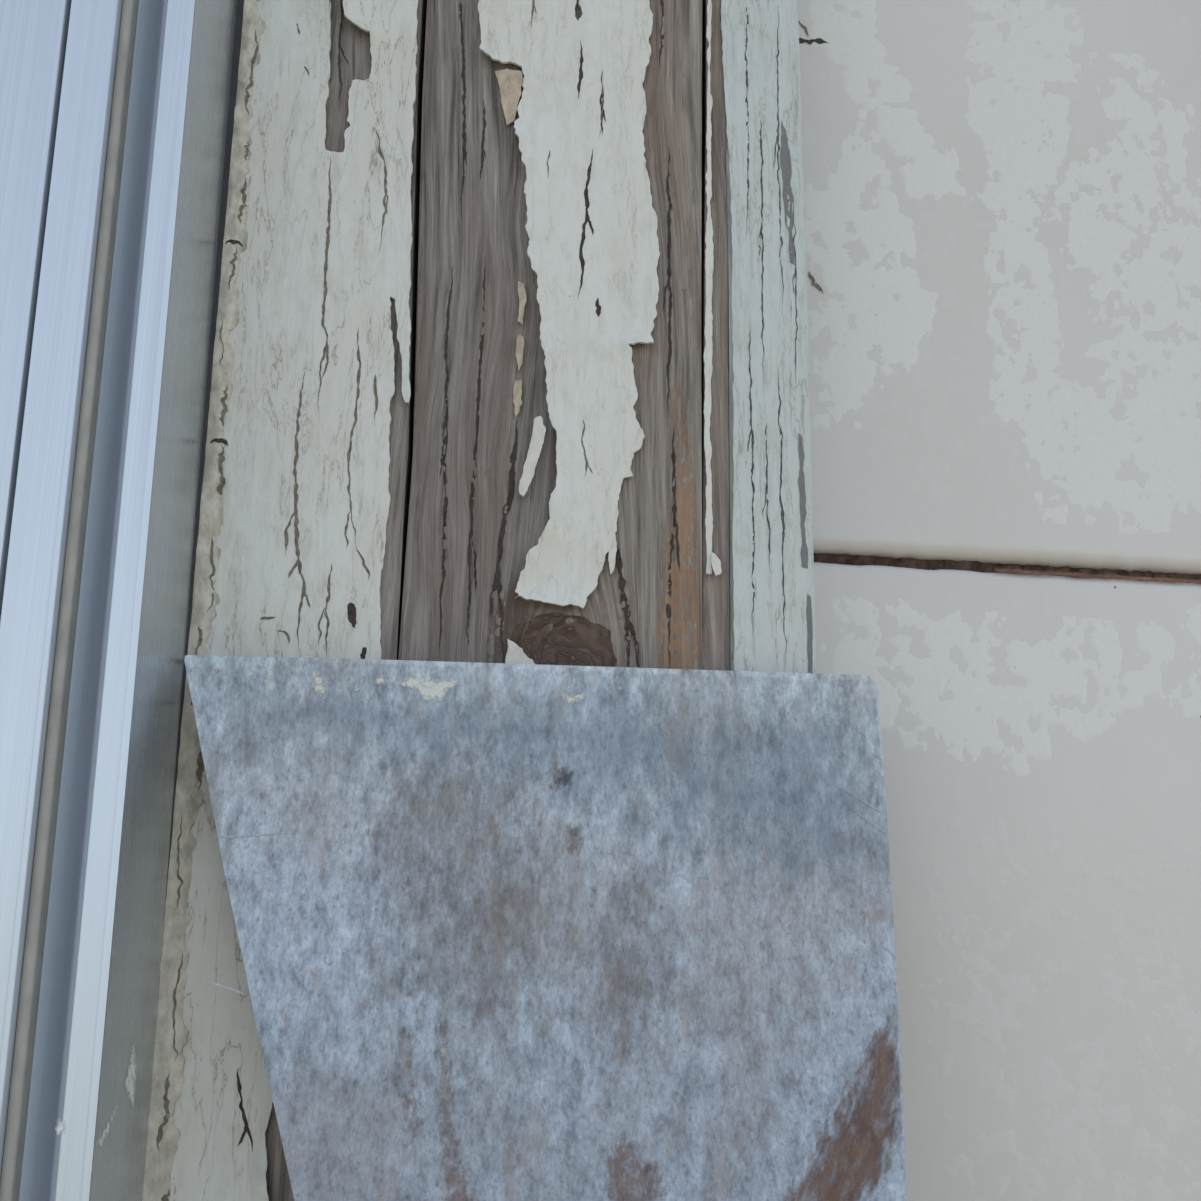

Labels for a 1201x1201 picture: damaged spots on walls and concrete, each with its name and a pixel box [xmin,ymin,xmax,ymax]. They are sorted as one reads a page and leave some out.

peeling [325,0,372,152]
crack [374,128,388,250]
crack [260,157,378,656]
peeling [360,0,722,670]
peeling [347,602,356,628]